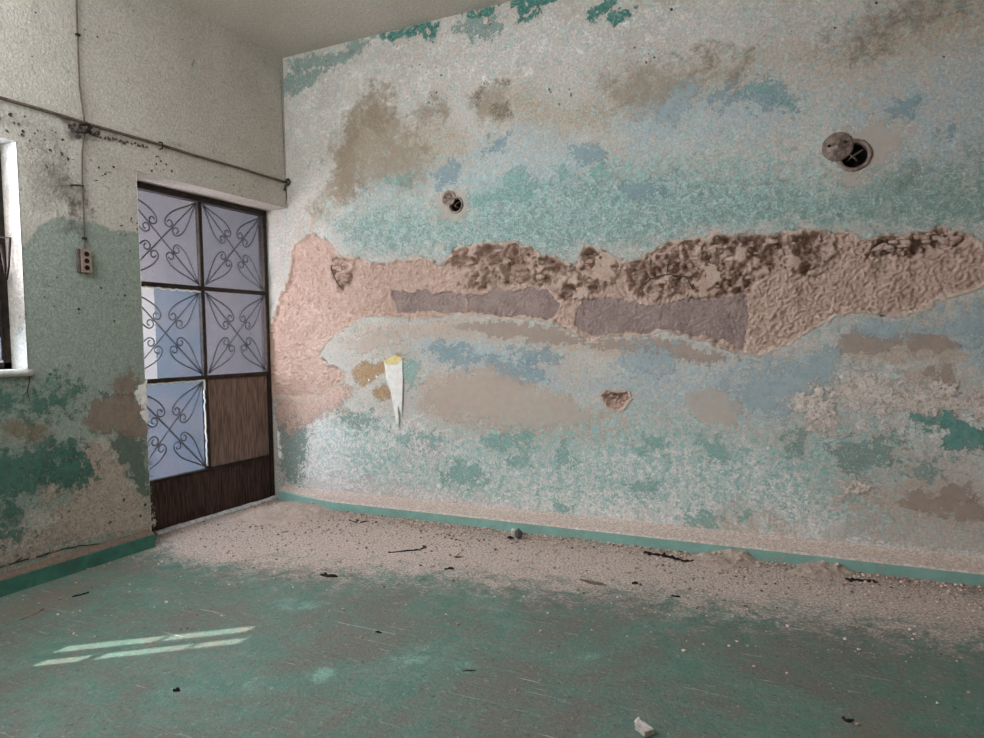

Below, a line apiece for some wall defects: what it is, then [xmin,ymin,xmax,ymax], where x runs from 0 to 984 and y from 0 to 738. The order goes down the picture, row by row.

flaking render [0,364,157,555]
flaking render [269,223,984,489]